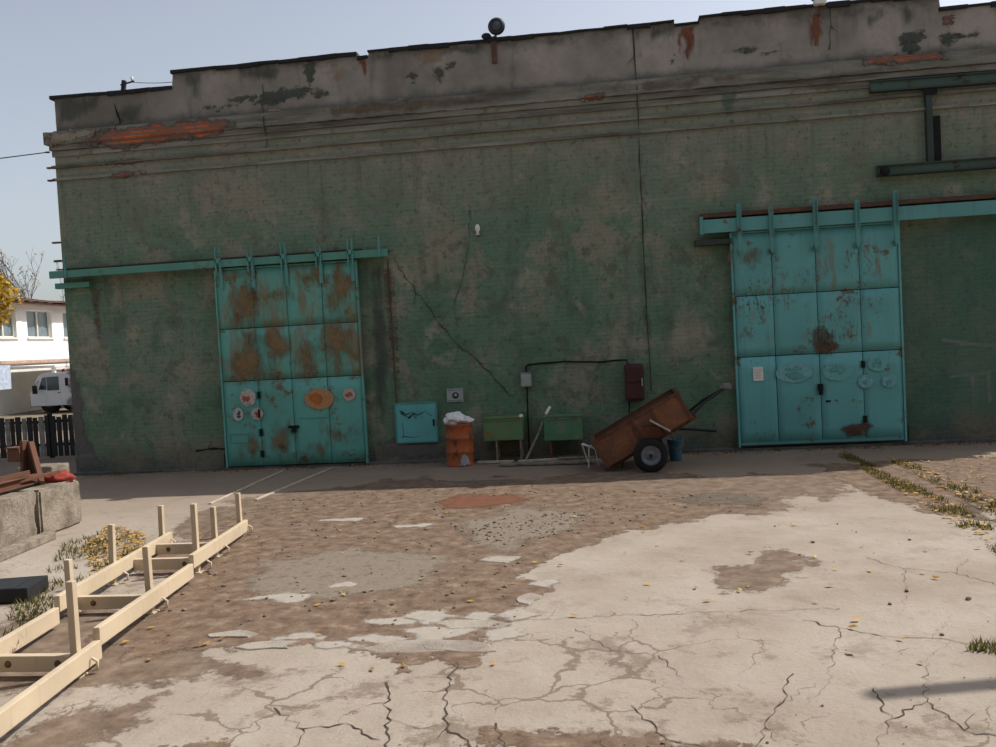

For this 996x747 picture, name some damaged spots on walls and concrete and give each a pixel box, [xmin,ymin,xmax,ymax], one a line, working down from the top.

rust [678,27,694,58]
spalling [43,118,236,179]
rust [224,268,314,380]
crack [393,206,513,398]
rust [812,310,858,354]
rust [841,422,872,436]